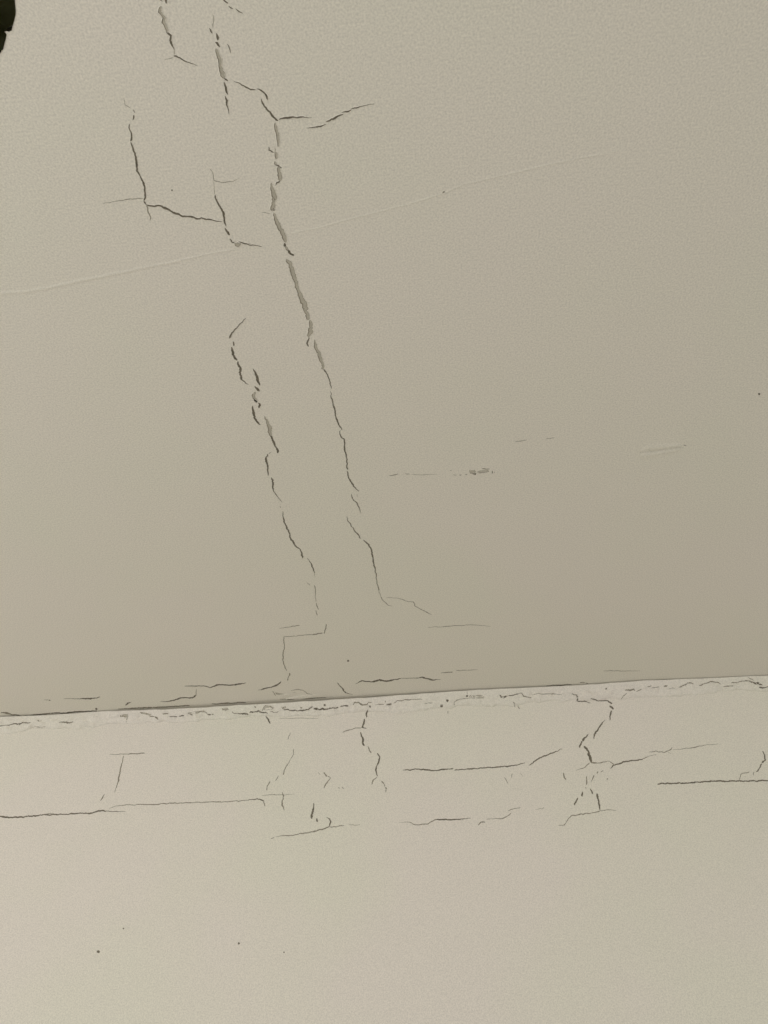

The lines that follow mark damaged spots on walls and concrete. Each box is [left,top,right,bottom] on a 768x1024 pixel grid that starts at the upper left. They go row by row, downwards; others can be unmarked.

crack [103,0,490,628]
crack [0,318,768,839]